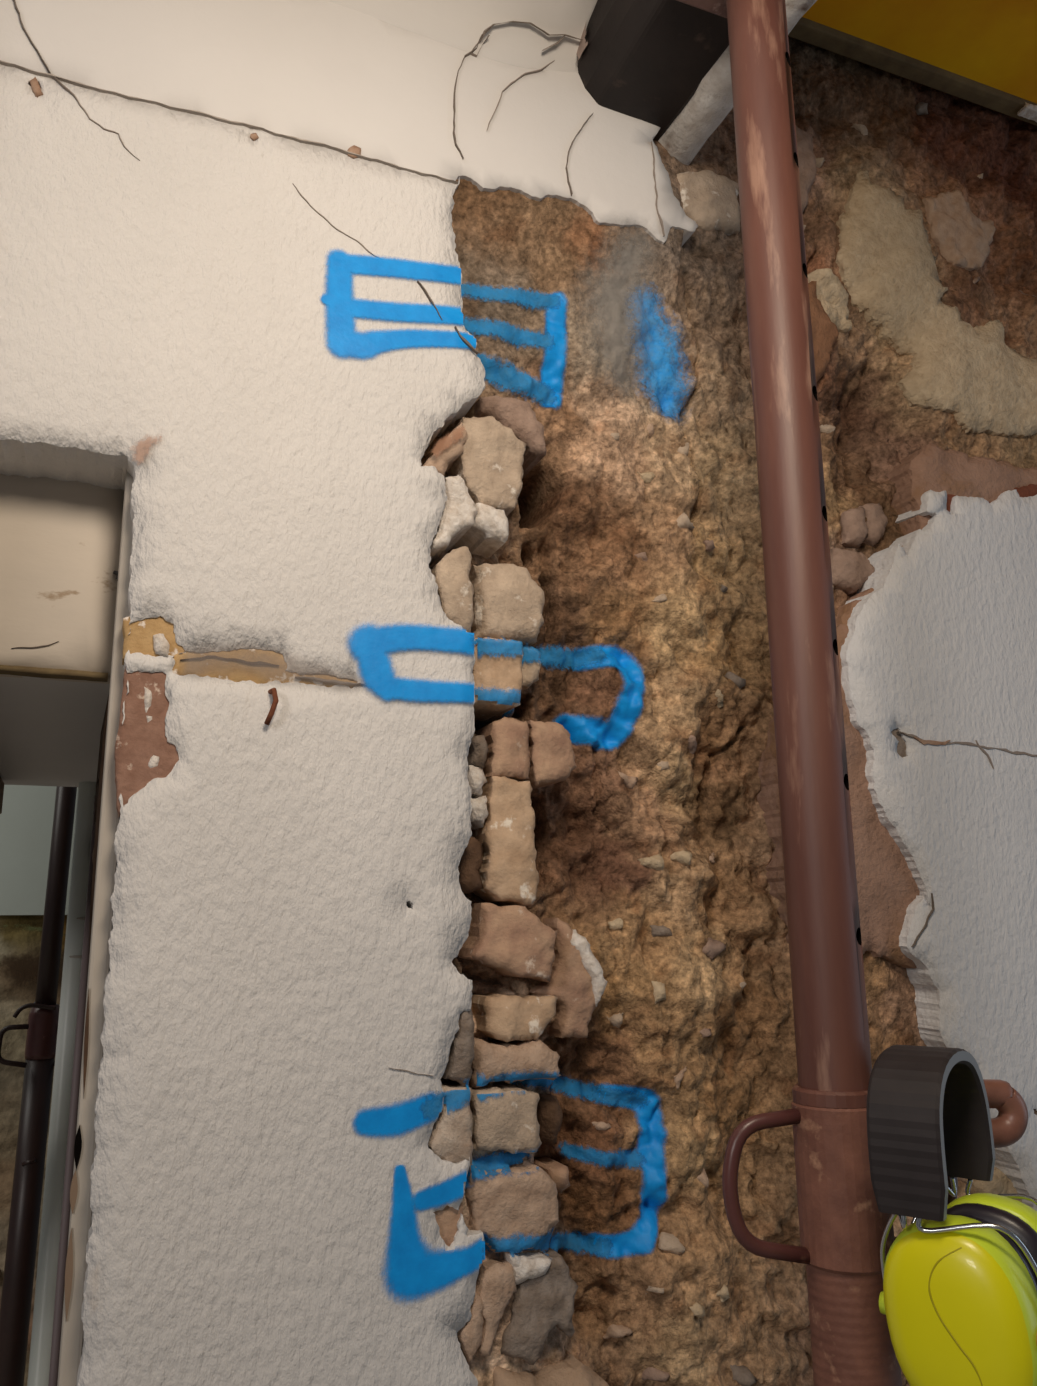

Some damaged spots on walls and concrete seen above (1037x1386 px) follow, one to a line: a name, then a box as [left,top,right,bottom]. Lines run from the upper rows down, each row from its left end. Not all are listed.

crack [0,0,582,184]
crack [565,113,593,196]
crack [293,184,377,257]
crack [417,281,479,355]
flaking render [788,36,1037,1068]
flaking render [114,616,366,817]
flaking render [421,108,814,1386]
crack [897,731,1037,769]
flaking render [957,1167,1022,1202]
flaking render [893,1216,913,1237]